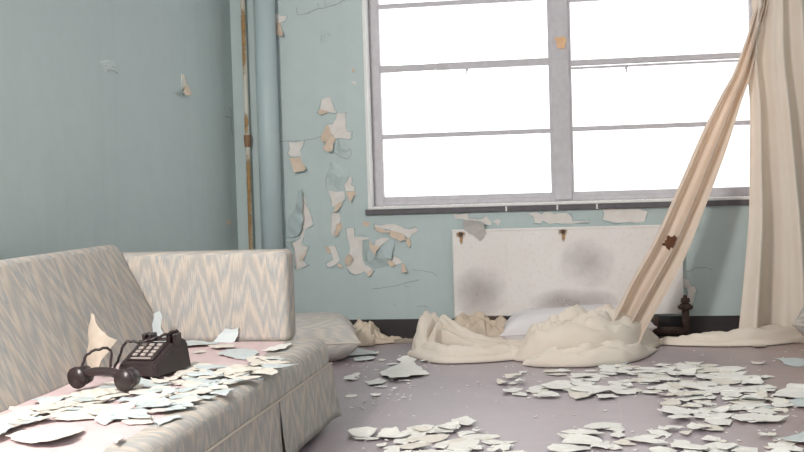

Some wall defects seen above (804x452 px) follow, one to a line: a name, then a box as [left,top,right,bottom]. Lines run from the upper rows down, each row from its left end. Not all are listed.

peeling [316,96,353,152]
peeling [287,139,306,172]
peeling [283,187,315,270]
peeling [324,175,418,276]
peeling [453,212,500,241]
peeling [528,211,590,225]
peeling [602,208,649,224]